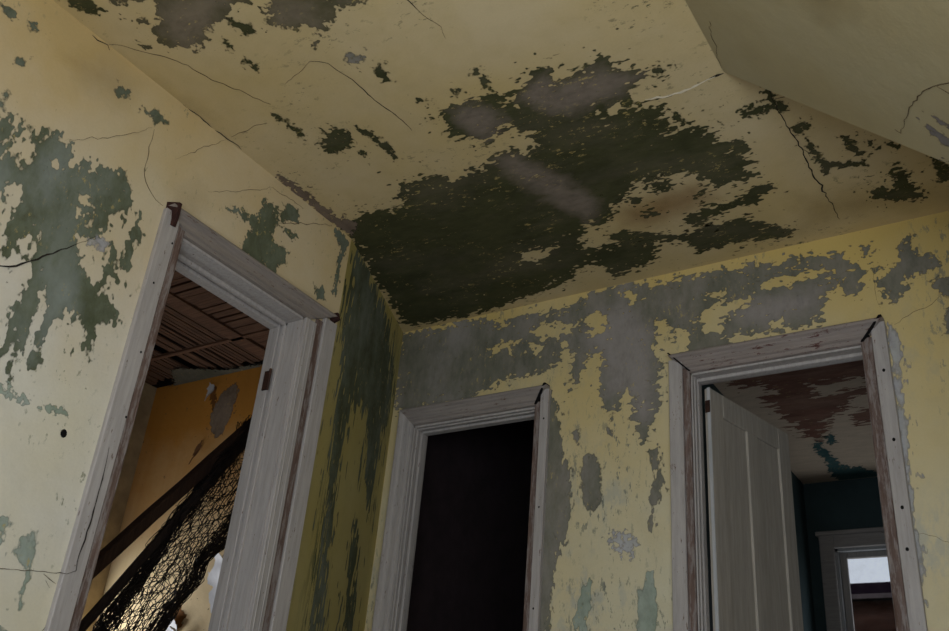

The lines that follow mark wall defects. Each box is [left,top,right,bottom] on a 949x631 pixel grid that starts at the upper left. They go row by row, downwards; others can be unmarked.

peeling [1,4,17,21]
peeling [115,86,131,99]
crack [93,36,269,156]
crack [287,61,411,129]
crack [896,82,949,133]
crack [70,128,163,206]
crack [770,92,838,217]
crack [0,237,93,268]
peeling [0,91,146,416]
peeling [225,47,949,631]
crack [0,449,109,583]